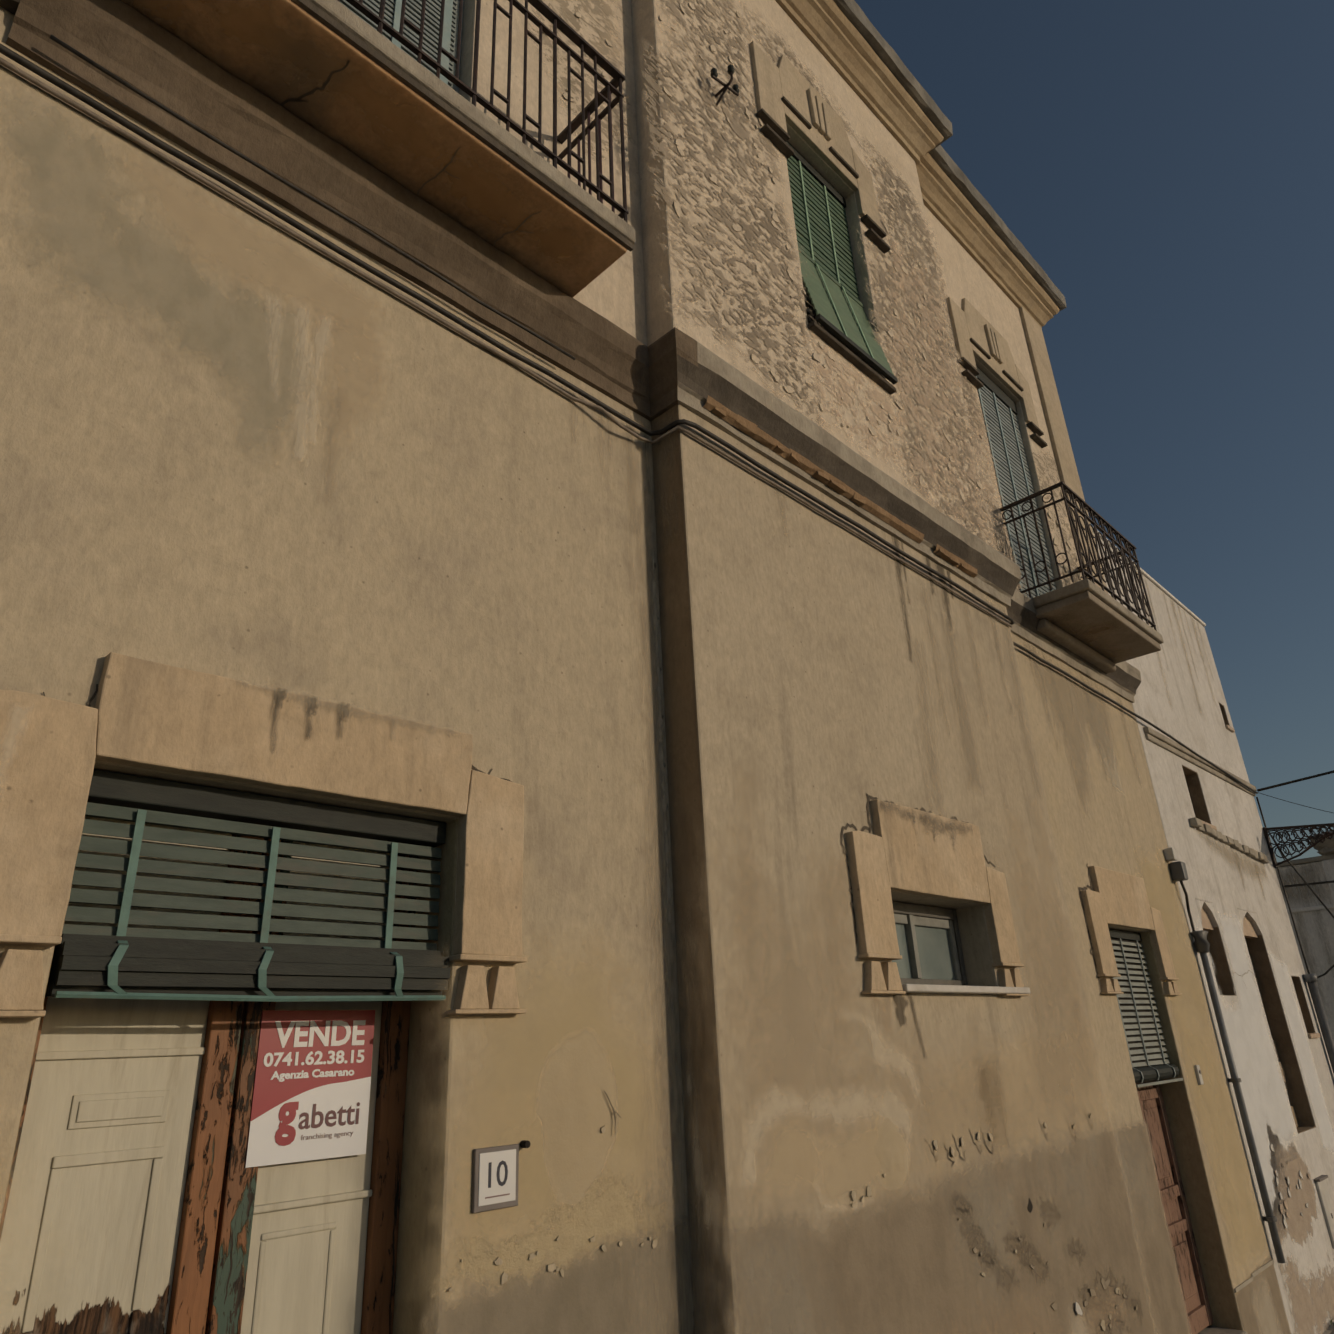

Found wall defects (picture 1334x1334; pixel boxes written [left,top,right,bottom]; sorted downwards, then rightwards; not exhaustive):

peeling [534,0,626,157]
peeling [645,0,1024,595]
leakage [272,689,286,736]
leakage [307,697,364,738]
peeling [925,1129,993,1166]
peeling [1200,916,1334,1334]
peeling [441,1173,668,1291]